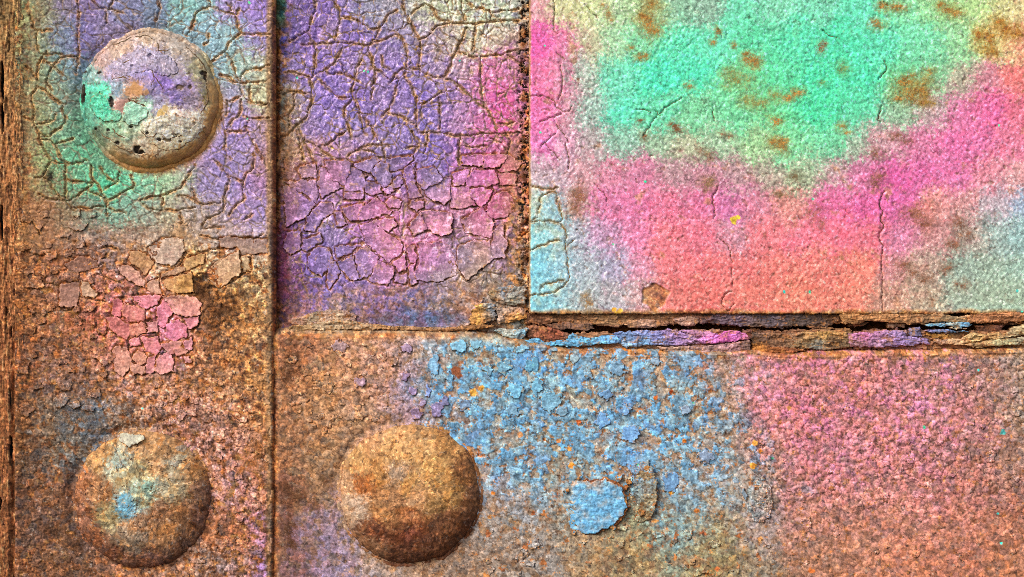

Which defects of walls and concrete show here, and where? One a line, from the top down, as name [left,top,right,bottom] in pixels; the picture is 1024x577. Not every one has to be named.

rust [871,1,907,28]
rust [973,18,1022,56]
rust [723,43,805,106]
rust [892,69,936,107]
crack [26,0,522,289]
rust [19,208,116,429]
peeling [58,256,98,308]
peeling [105,236,268,377]
peeling [288,285,1024,419]
rust [153,378,263,487]
peeling [593,389,641,443]
peeling [662,472,679,493]